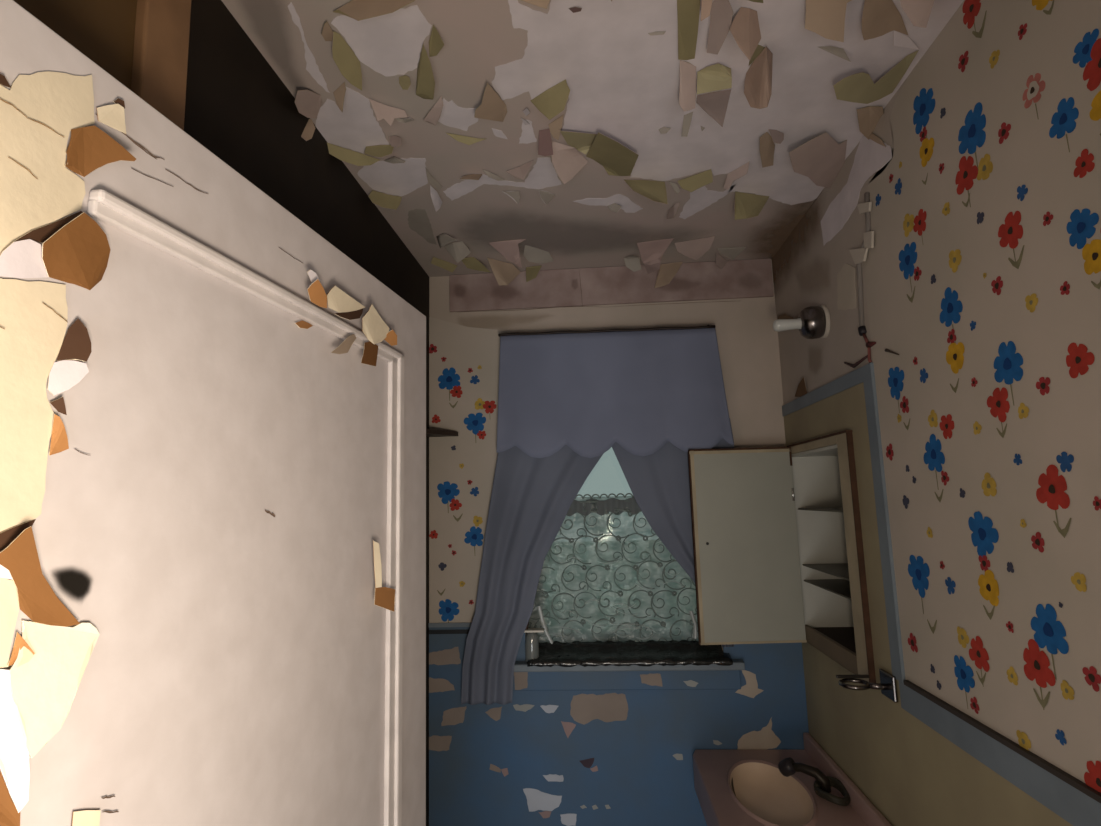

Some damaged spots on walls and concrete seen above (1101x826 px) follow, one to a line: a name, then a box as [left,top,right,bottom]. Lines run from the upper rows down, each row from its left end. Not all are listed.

peeling [65,98,136,177]
peeling [288,0,964,288]
peeling [0,211,111,290]
peeling [307,269,397,367]
peeling [47,319,92,456]
peeling [373,541,395,612]
peeling [0,519,101,826]
spalling [429,706,466,751]
spalling [485,693,628,738]
spalling [735,670,764,698]
spalling [737,717,781,750]
spalling [523,774,577,826]